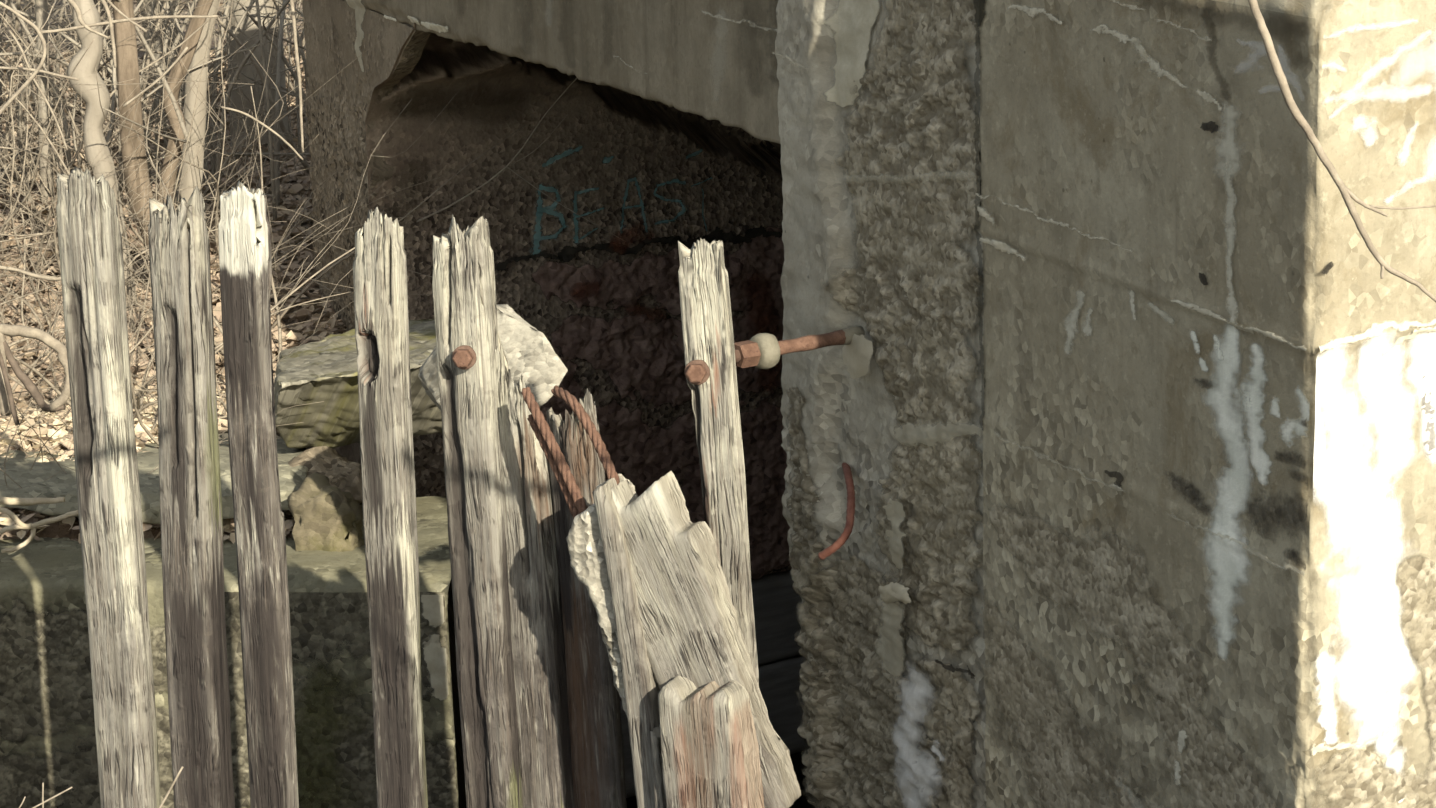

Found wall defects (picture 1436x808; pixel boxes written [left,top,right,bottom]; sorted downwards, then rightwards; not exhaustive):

spalling [532,248,704,523]
rust [745,273,777,336]
rust [759,359,781,390]
spalling [723,0,1276,808]
water stain [1065,291,1093,354]
water stain [1129,290,1174,323]
water stain [1190,106,1436,774]
water stain [883,498,906,569]
spalling [1247,452,1308,570]
water stain [873,602,944,808]
spalling [1312,555,1436,808]